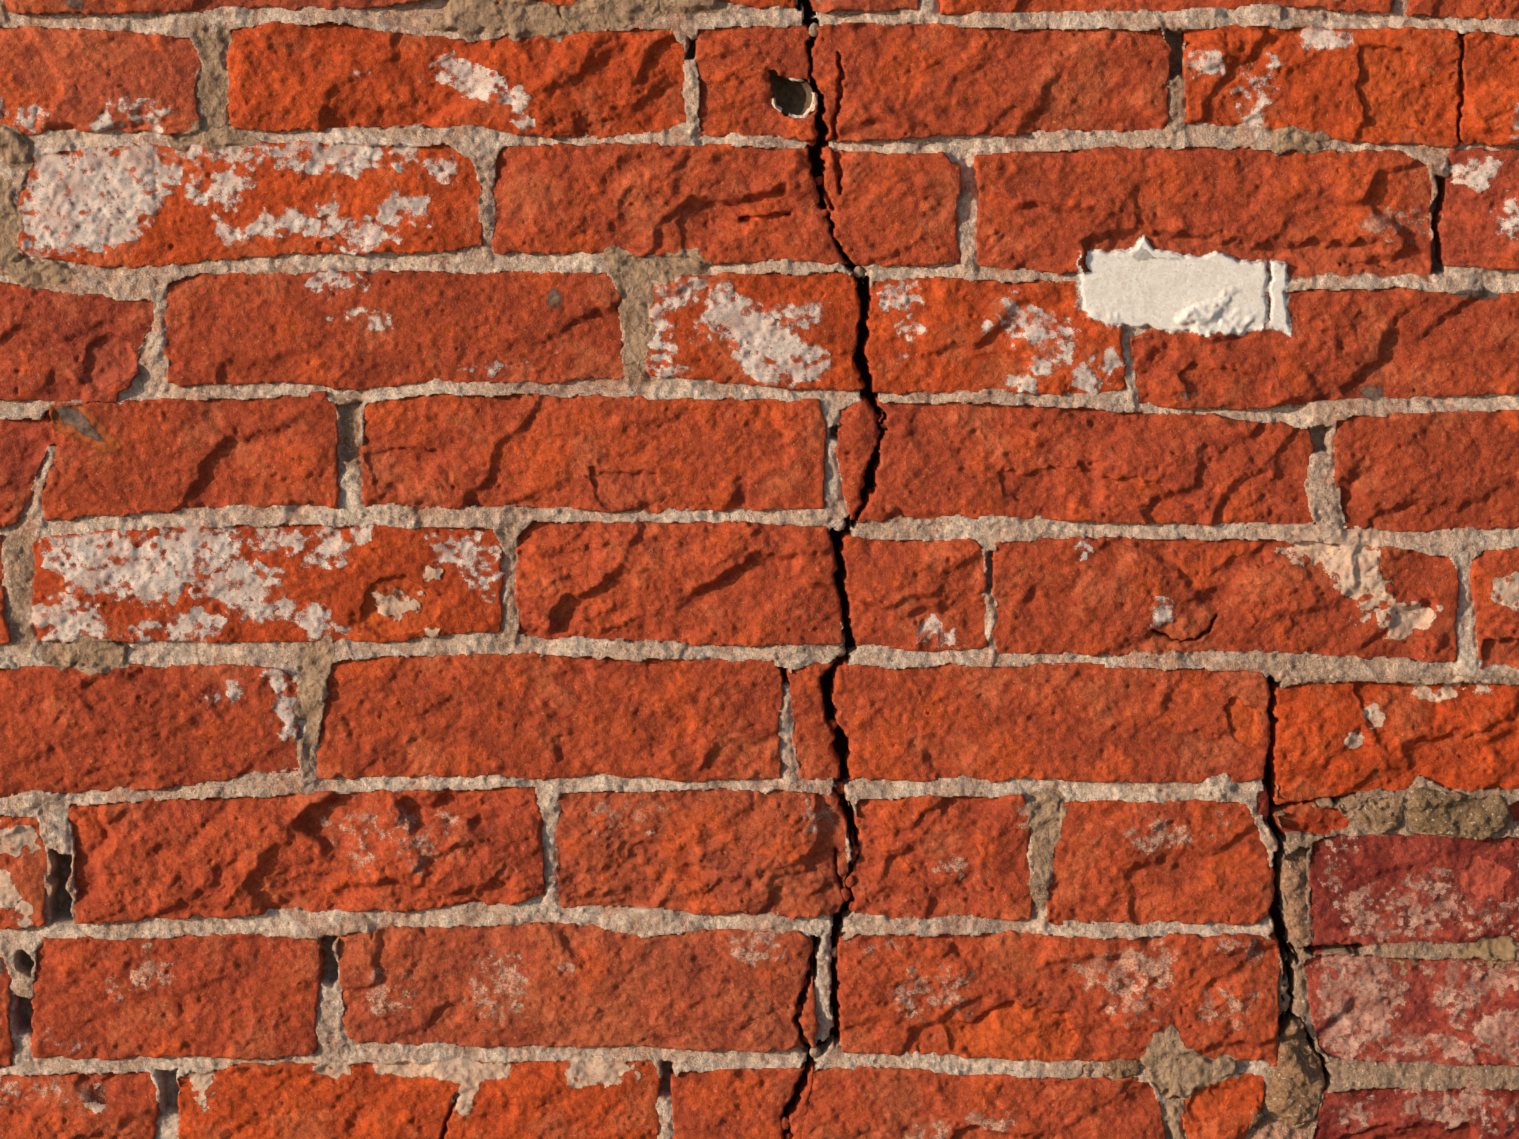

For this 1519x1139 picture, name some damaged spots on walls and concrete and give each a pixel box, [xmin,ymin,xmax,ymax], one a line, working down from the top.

crack [739,0,885,1139]
crack [1262,675,1355,1074]
efflorescence [1315,832,1519,1139]